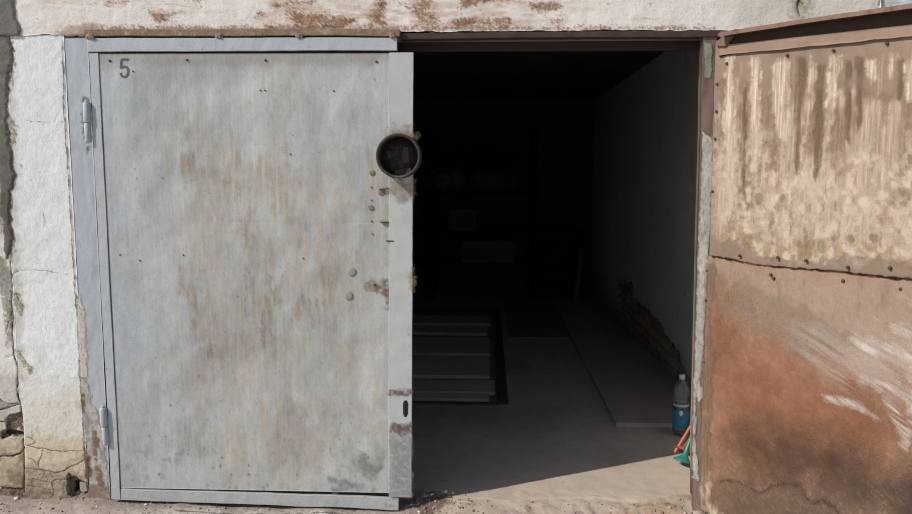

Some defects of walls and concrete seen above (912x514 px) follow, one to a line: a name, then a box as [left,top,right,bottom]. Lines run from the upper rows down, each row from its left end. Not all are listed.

corrosion [101,0,531,31]
corrosion [529,2,716,31]
water stain [713,56,912,265]
crack [0,40,88,496]
peeling [67,294,110,500]
corrosion [365,279,389,304]
corrosion [390,423,412,435]
peeling [613,132,713,481]